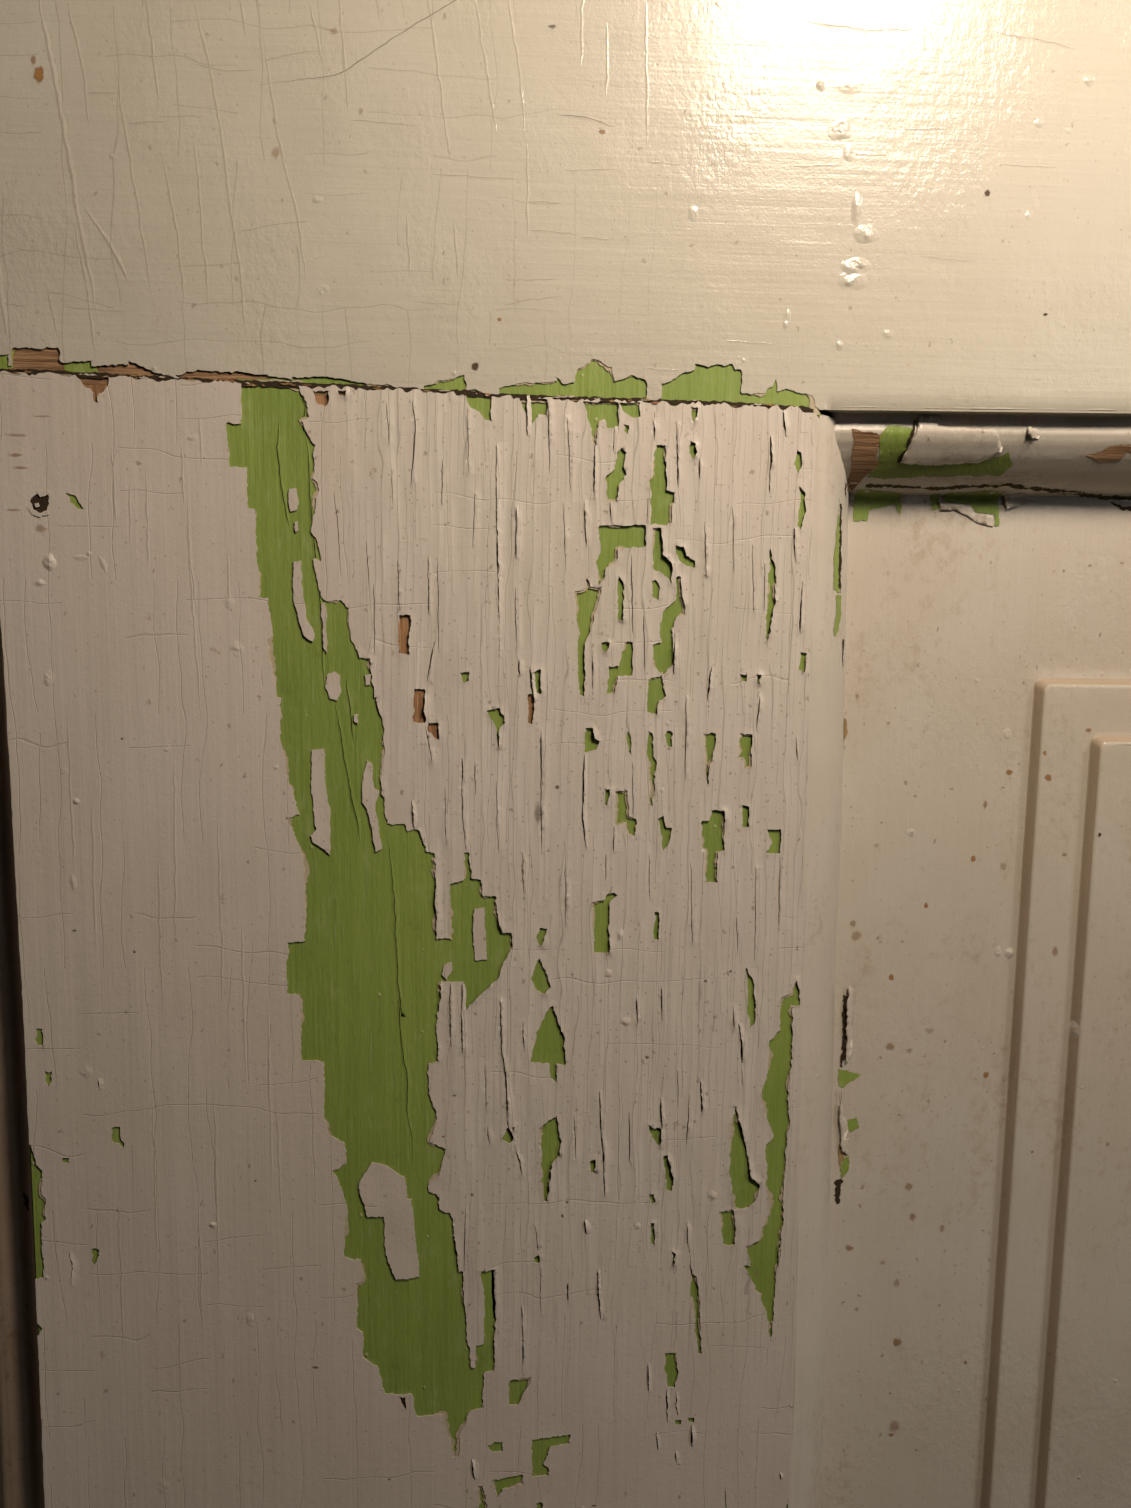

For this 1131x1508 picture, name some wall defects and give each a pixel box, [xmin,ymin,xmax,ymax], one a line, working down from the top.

peeling [424,359,821,502]
crack [0,0,813,1180]
peeling [574,445,695,850]
peeling [833,416,1029,636]
peeling [0,347,513,1457]
peeling [531,928,566,1082]
crack [840,995,849,1067]
crack [574,1072,709,1234]
peeling [719,982,800,1340]
crack [834,1178,843,1204]
crack [464,1212,604,1374]
crack [647,1363,697,1462]